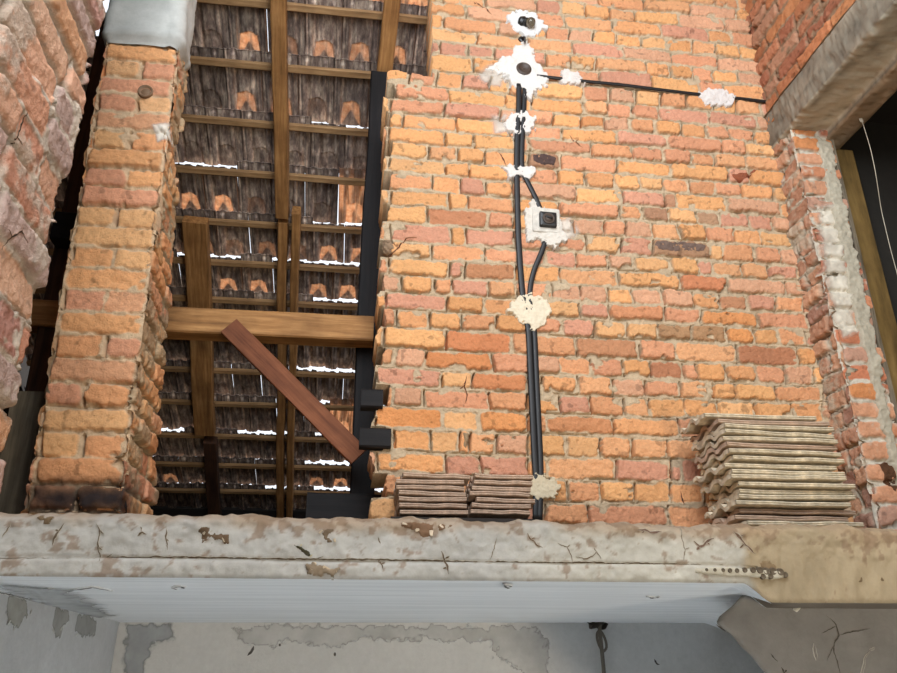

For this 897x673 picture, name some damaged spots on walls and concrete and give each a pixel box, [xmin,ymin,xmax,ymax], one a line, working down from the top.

spalling [198,527,229,544]
spalling [401,517,452,538]
spalling [294,544,340,580]
peeling [7,595,32,631]
peeling [52,607,97,638]
peeling [123,623,175,673]
peeling [235,623,549,673]
crack [812,617,875,673]